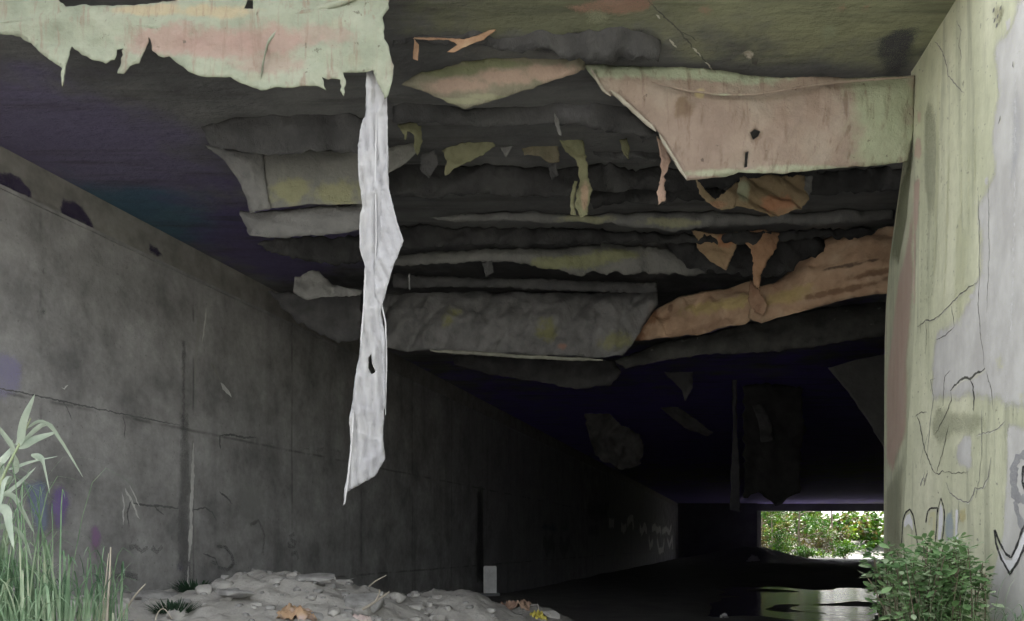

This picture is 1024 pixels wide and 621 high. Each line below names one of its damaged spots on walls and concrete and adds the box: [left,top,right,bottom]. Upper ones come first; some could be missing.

crack [0,388,176,436]
crack [916,181,1005,531]